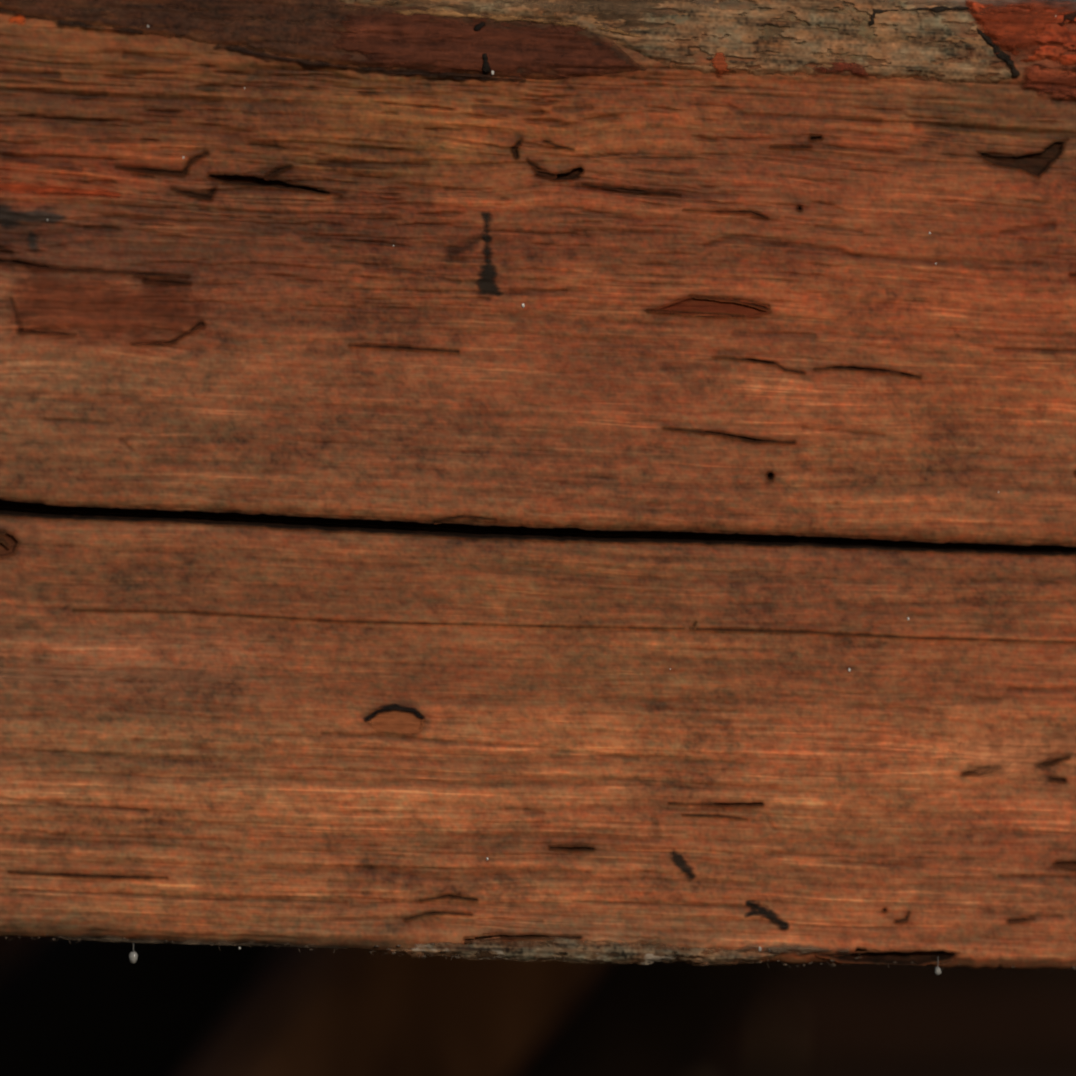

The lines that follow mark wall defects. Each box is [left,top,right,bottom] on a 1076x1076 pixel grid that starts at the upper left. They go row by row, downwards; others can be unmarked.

peeling [0,0,1020,85]
crack [0,496,1076,558]